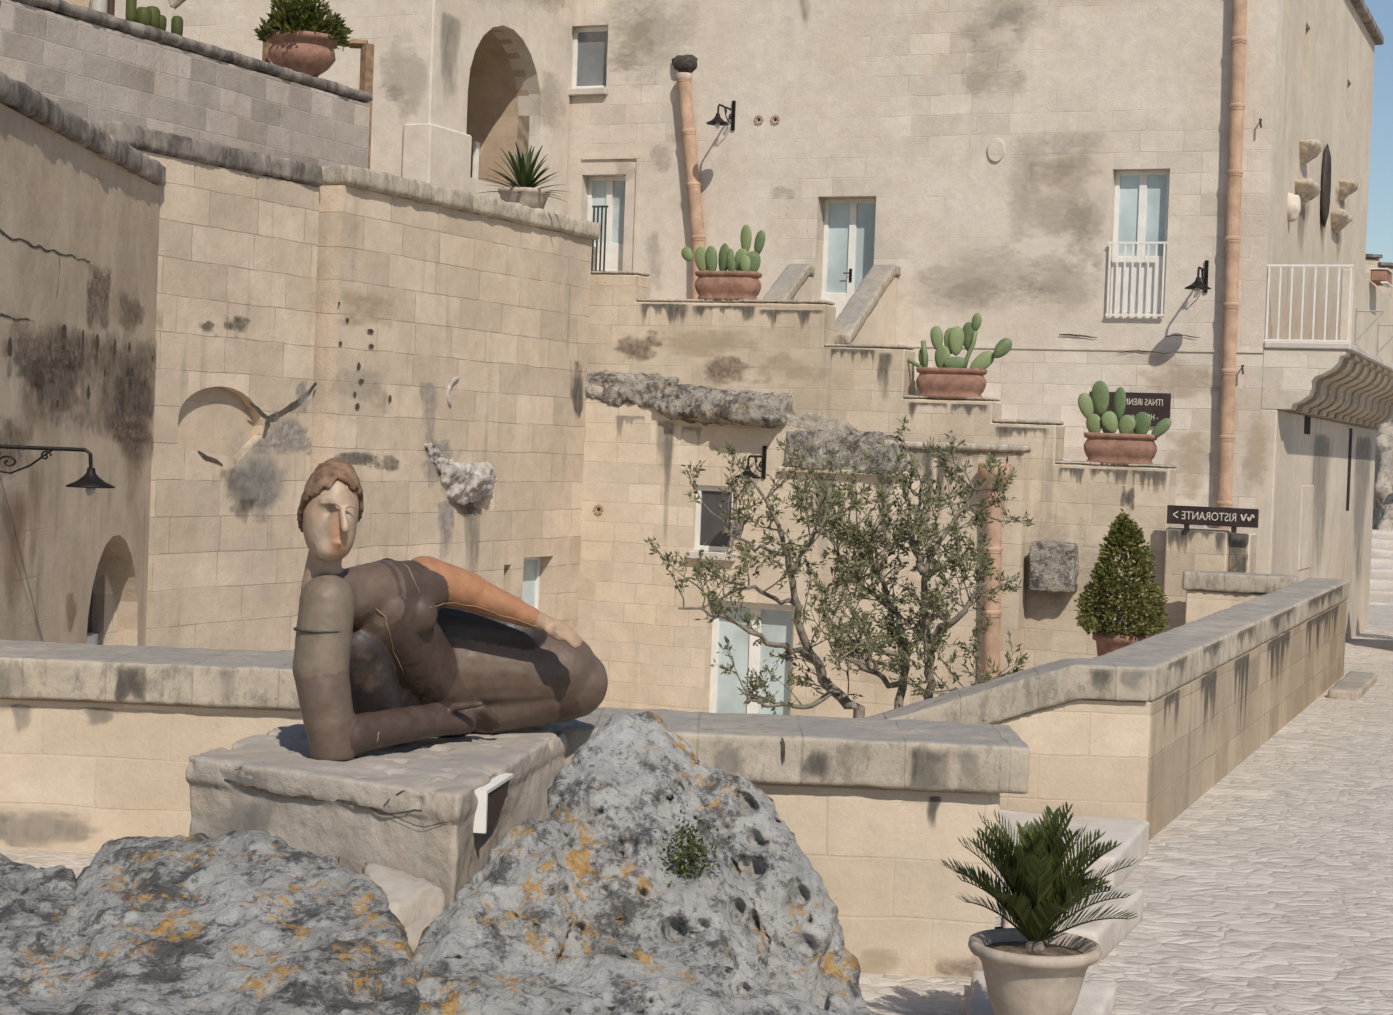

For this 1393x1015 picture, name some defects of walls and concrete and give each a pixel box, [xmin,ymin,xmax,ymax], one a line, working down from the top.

crack [0,229,90,293]
crack [0,313,33,321]
damp [642,304,821,323]
damp [832,349,890,379]
crack [249,382,317,439]
damp [910,402,986,414]
crack [198,450,223,466]
damp [1269,585,1343,674]
damp [1205,626,1255,711]
damp [1165,690,1179,715]
damp [1202,671,1217,713]